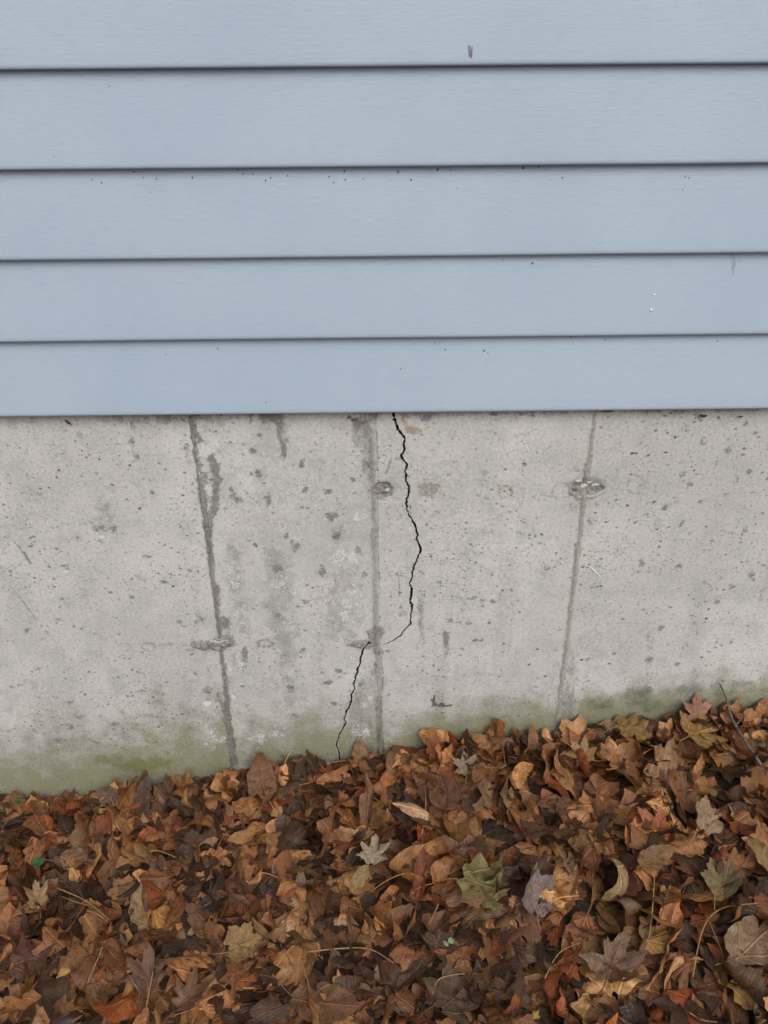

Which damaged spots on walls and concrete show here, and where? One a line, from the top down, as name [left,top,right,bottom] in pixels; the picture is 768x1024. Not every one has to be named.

leakage [324,655,374,708]
crack [336,412,422,760]